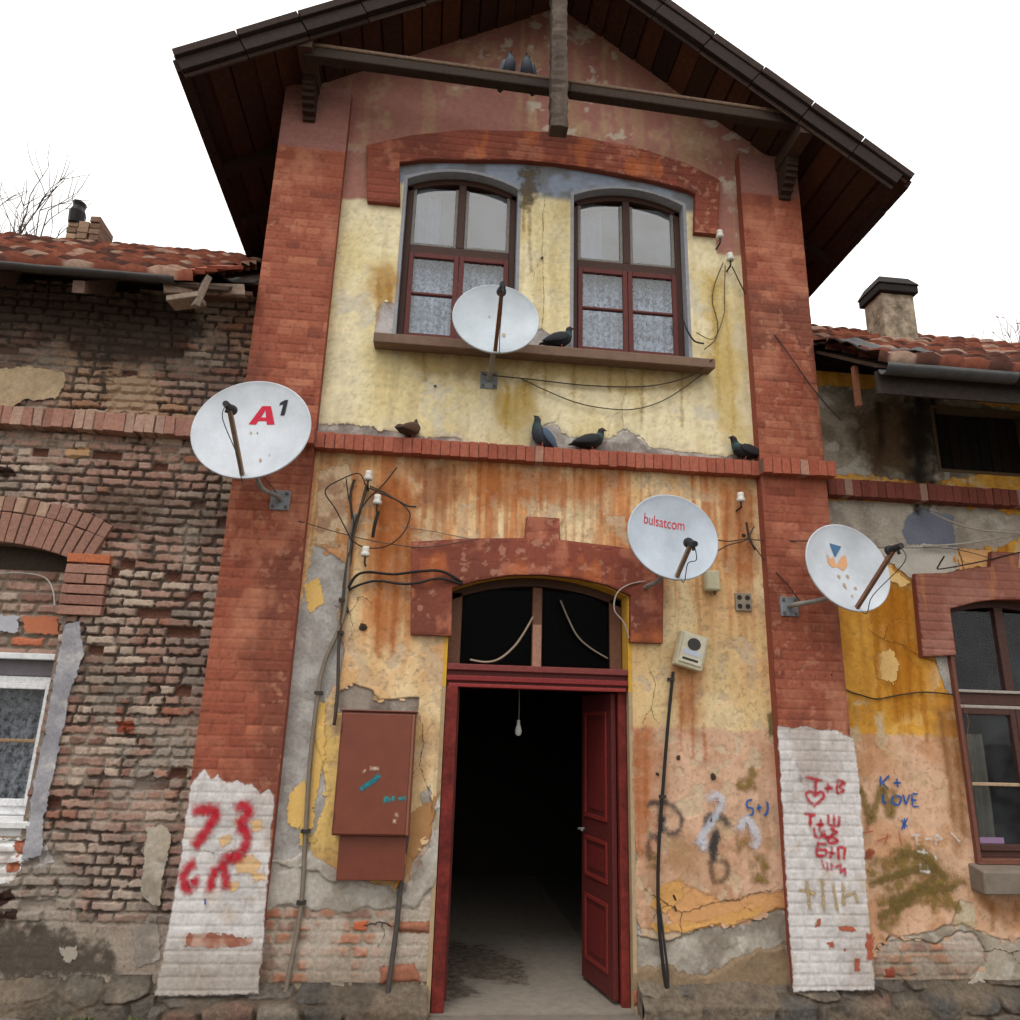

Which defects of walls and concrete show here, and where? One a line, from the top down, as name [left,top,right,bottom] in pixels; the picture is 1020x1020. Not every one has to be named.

spalling [318,423,463,442]
spalling [542,421,755,461]
leakage [904,397,937,485]
spalling [0,466,17,477]
peeling [875,648,900,685]
peeling [935,656,953,696]
spalling [115,720,136,733]
flaking render [260,463,441,992]
peeling [0,837,29,920]
peeling [633,876,793,1016]
flaking render [872,900,1020,984]